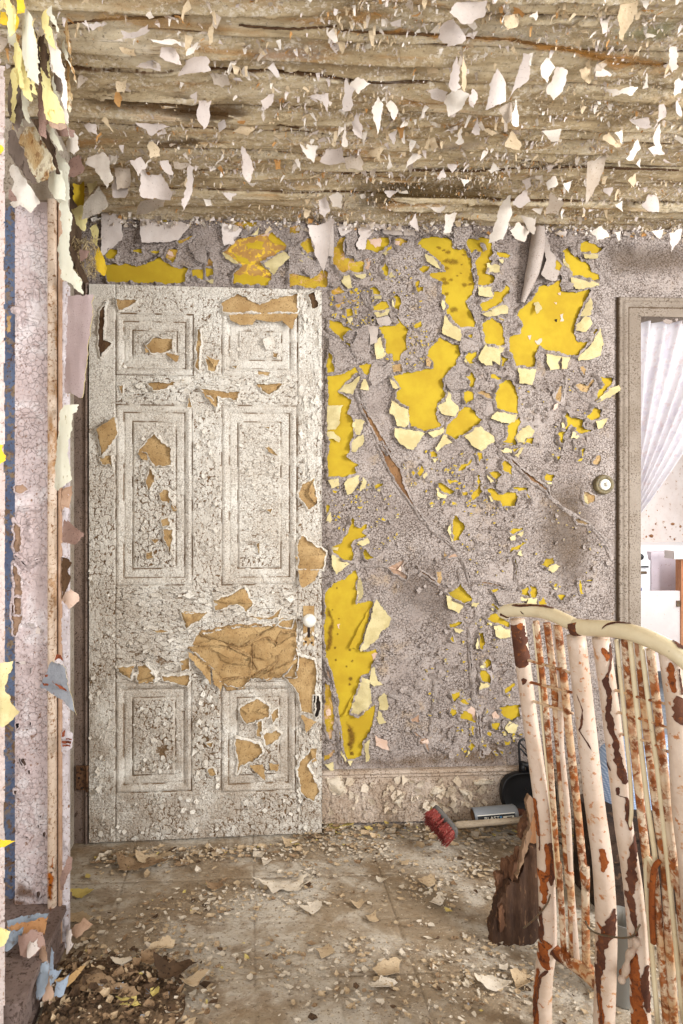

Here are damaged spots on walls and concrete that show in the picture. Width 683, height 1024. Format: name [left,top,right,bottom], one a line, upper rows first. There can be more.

peeling [319,77,430,171]
peeling [426,18,531,150]
peeling [546,65,648,100]
peeling [603,46,683,187]
peeling [88,123,623,847]
crack [327,291,520,758]
crack [487,420,614,561]
corrosion [667,662,677,693]
corrosion [532,797,555,904]
corrosion [599,849,609,873]
corrosion [533,938,552,1024]
corrosion [629,953,648,1024]